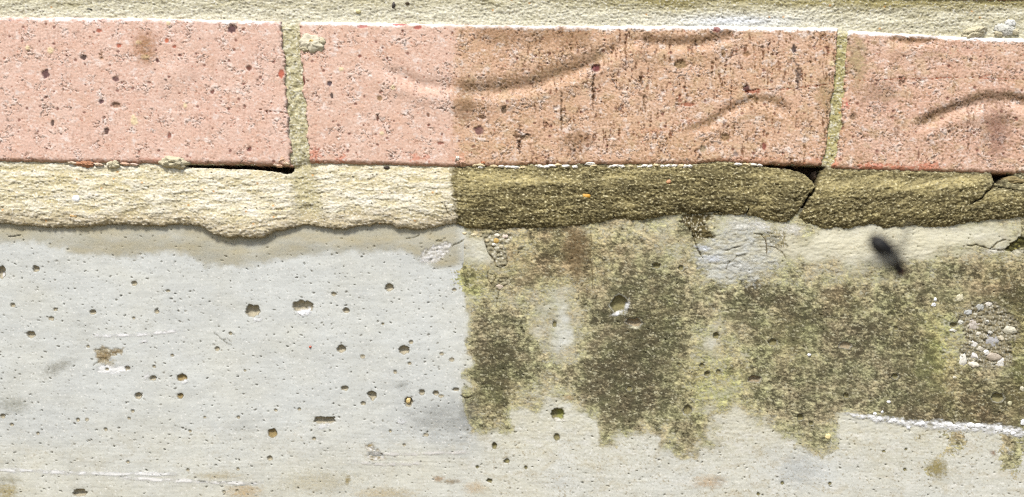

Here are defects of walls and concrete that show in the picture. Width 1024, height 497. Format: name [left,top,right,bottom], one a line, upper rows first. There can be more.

damp [581,367,711,460]
damp [767,400,1024,477]